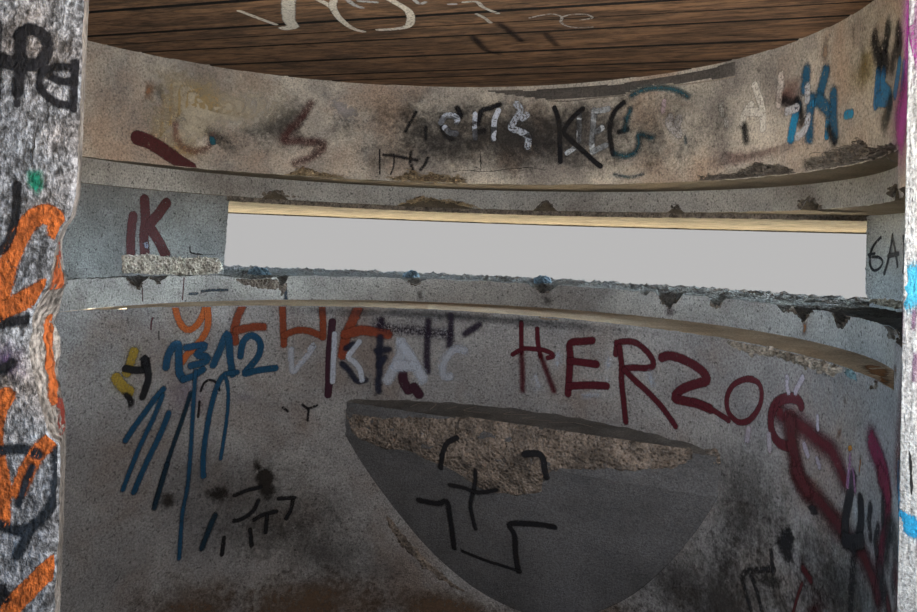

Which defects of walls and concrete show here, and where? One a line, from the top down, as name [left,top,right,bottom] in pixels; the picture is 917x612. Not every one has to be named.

spalling [697,137,897,181]
spalling [121,246,223,290]
spalling [29,0,89,612]
spalling [869,298,903,309]